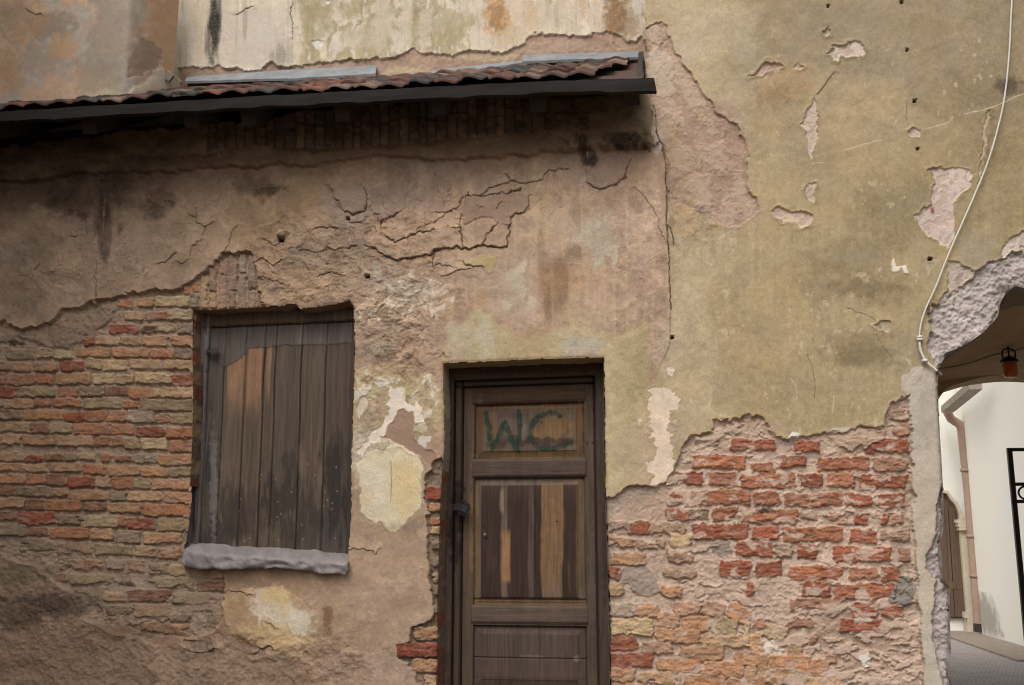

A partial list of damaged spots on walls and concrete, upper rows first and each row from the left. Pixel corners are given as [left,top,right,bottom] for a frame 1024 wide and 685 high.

crack [157,207,238,266]
damp [208,0,221,62]
crack [254,104,675,309]
spalling [126,21,820,228]
peeling [822,25,867,62]
spalling [914,109,1024,368]
spalling [0,250,304,685]
spalling [356,384,444,685]
spalling [606,364,950,685]